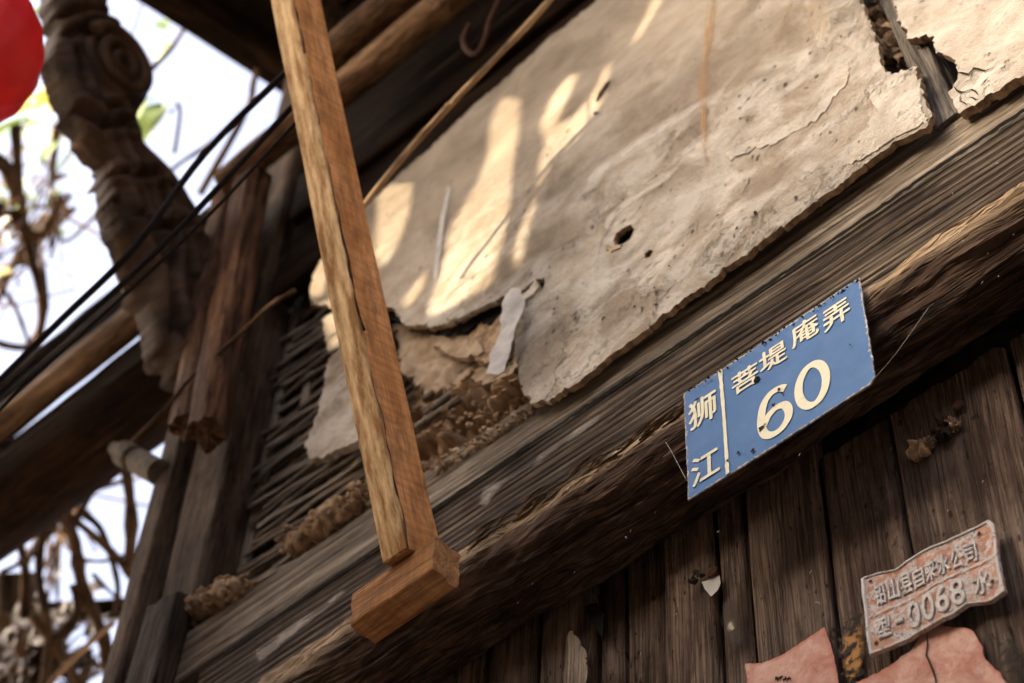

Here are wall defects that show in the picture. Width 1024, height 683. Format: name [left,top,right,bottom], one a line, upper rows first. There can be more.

spalling [389,296,530,473]